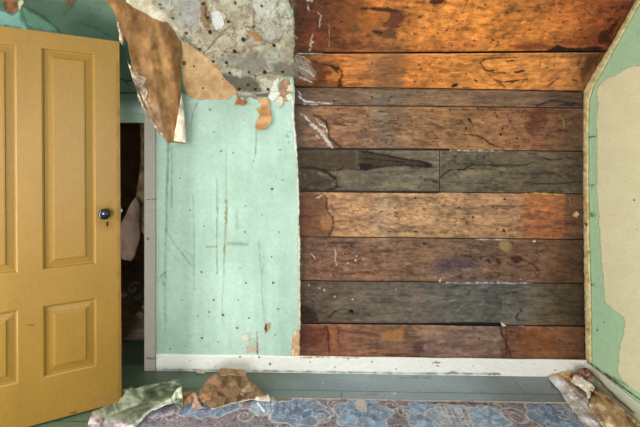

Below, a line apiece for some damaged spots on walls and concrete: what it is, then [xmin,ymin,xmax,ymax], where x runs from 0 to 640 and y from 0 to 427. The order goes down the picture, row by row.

peeling [126,0,297,158]
peeling [596,65,640,394]